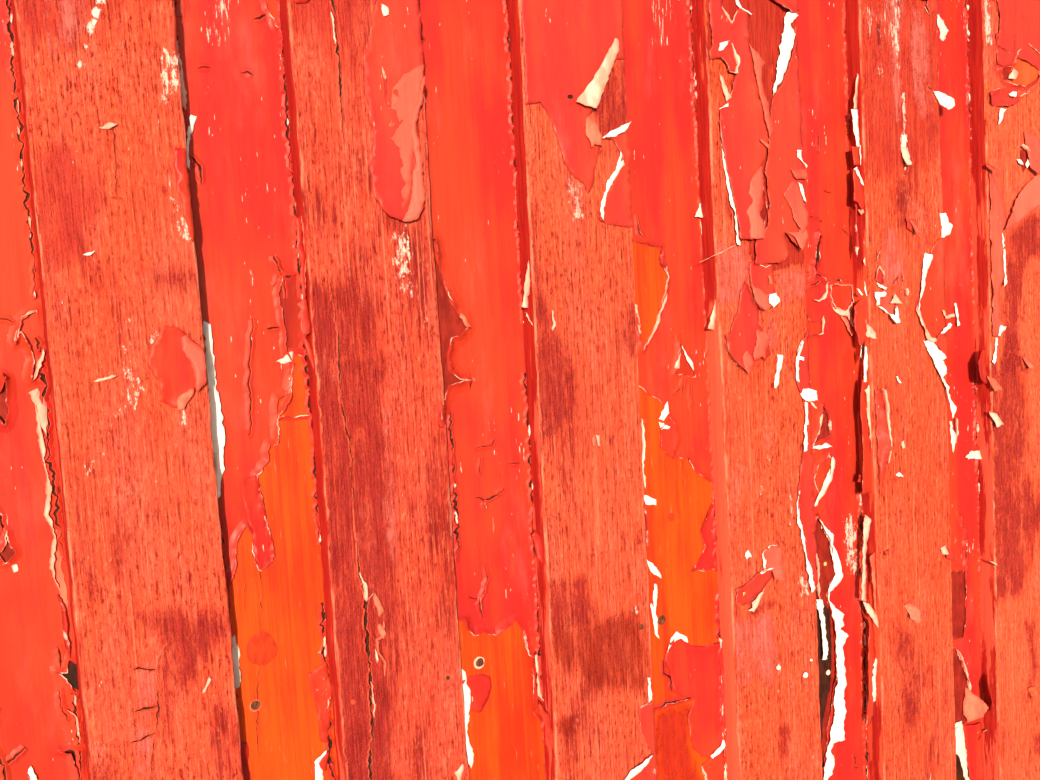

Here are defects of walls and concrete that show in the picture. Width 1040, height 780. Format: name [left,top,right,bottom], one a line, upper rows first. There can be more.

peeling [364,0,426,297]
peeling [521,0,672,357]
peeling [985,0,1040,124]
peeling [94,346,144,418]
peeling [147,321,225,498]
peeling [226,216,338,780]
peeling [625,380,727,780]
peeling [670,334,698,394]
peeling [708,0,960,780]
crack [0,708,29,780]
crack [130,642,168,780]
peeling [455,611,555,780]